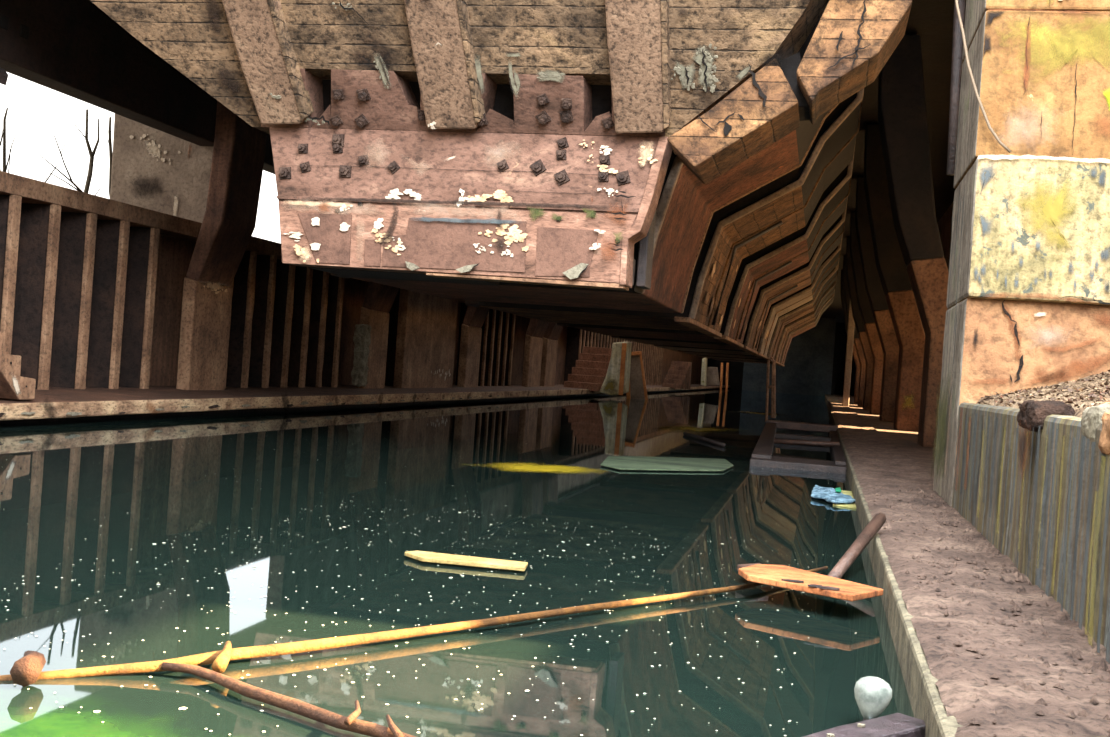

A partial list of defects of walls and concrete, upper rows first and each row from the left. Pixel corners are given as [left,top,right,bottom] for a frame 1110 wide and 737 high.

crack [828,0,870,69]
peeling [579,140,619,174]
peeling [638,143,658,166]
peeling [385,188,421,200]
peeling [456,189,513,207]
peeling [283,201,353,263]
peeling [371,218,420,271]
peeling [455,223,529,273]
crack [1002,300,1024,382]